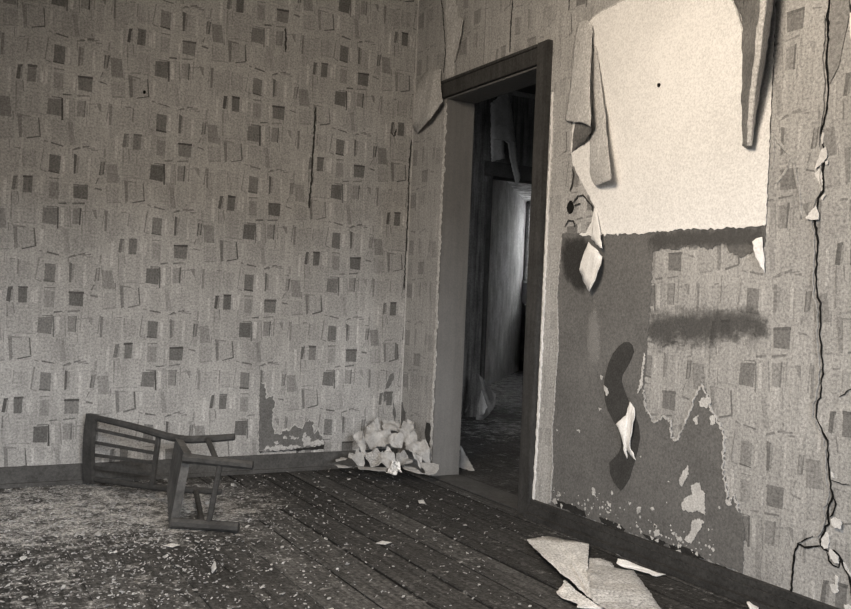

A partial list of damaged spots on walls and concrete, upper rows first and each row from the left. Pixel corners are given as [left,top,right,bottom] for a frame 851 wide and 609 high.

peeling [441,0,463,79]
peeling [532,0,776,573]
water stain [648,310,767,345]
crack [790,0,851,609]
peeling [258,382,325,453]